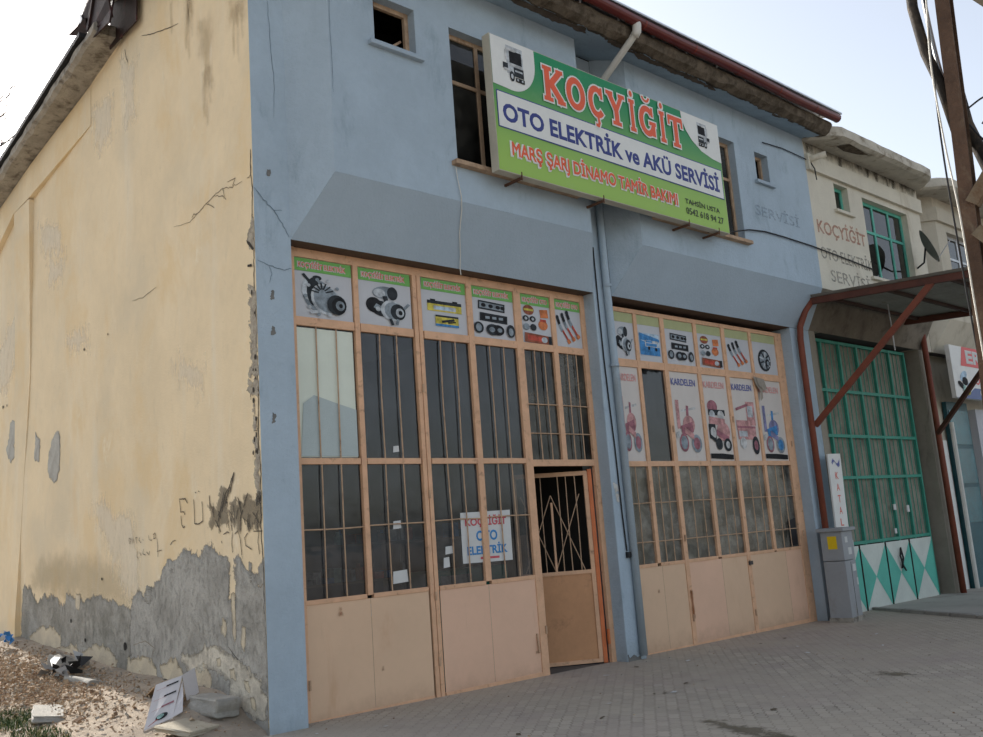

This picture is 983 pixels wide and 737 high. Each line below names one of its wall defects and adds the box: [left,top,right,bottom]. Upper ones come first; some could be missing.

crack [174,149,289,236]
flaking render [6,420,15,463]
flaking render [34,431,60,483]
crack [254,388,265,614]
flaking render [0,543,269,737]